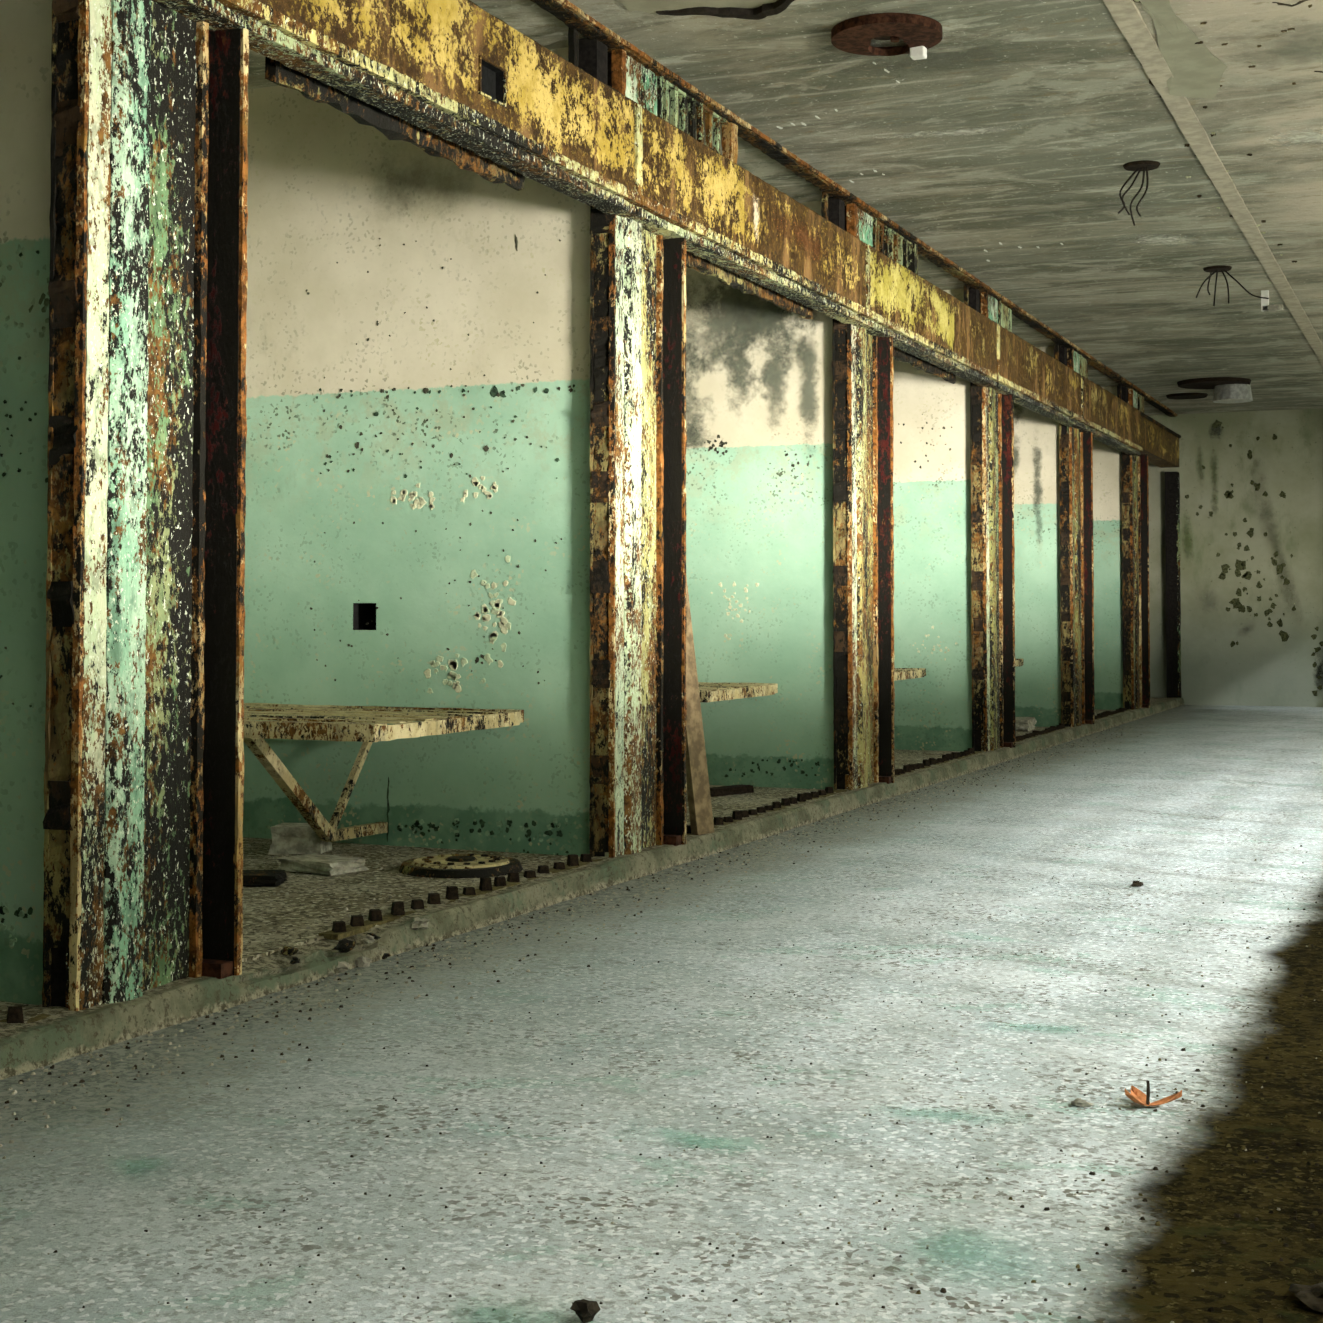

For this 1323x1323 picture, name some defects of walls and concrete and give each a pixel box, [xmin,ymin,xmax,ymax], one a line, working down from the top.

peeling [618,0,795,20]
leakage [686,282,816,447]